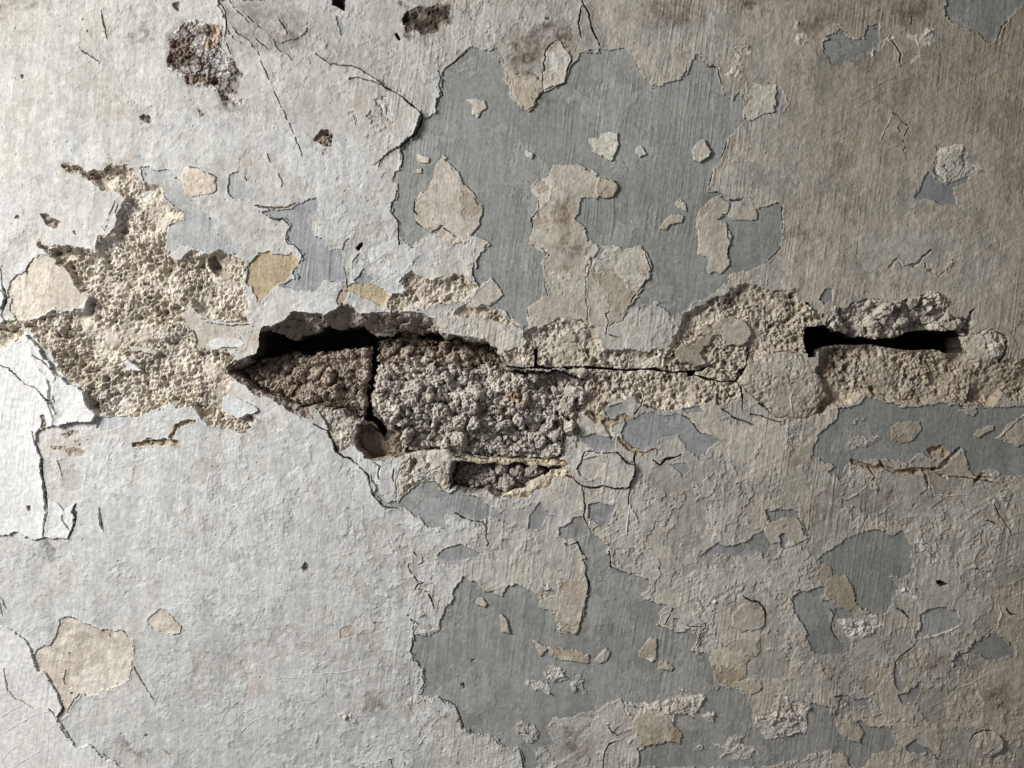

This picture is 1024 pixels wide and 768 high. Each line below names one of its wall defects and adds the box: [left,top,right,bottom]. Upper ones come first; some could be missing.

spalling [166,0,271,107]
spalling [395,3,451,41]
peeling [822,23,936,66]
peeling [0,36,1024,530]
crack [507,312,779,426]
crack [1,355,77,539]
peeling [33,616,134,717]
peeling [408,502,937,768]